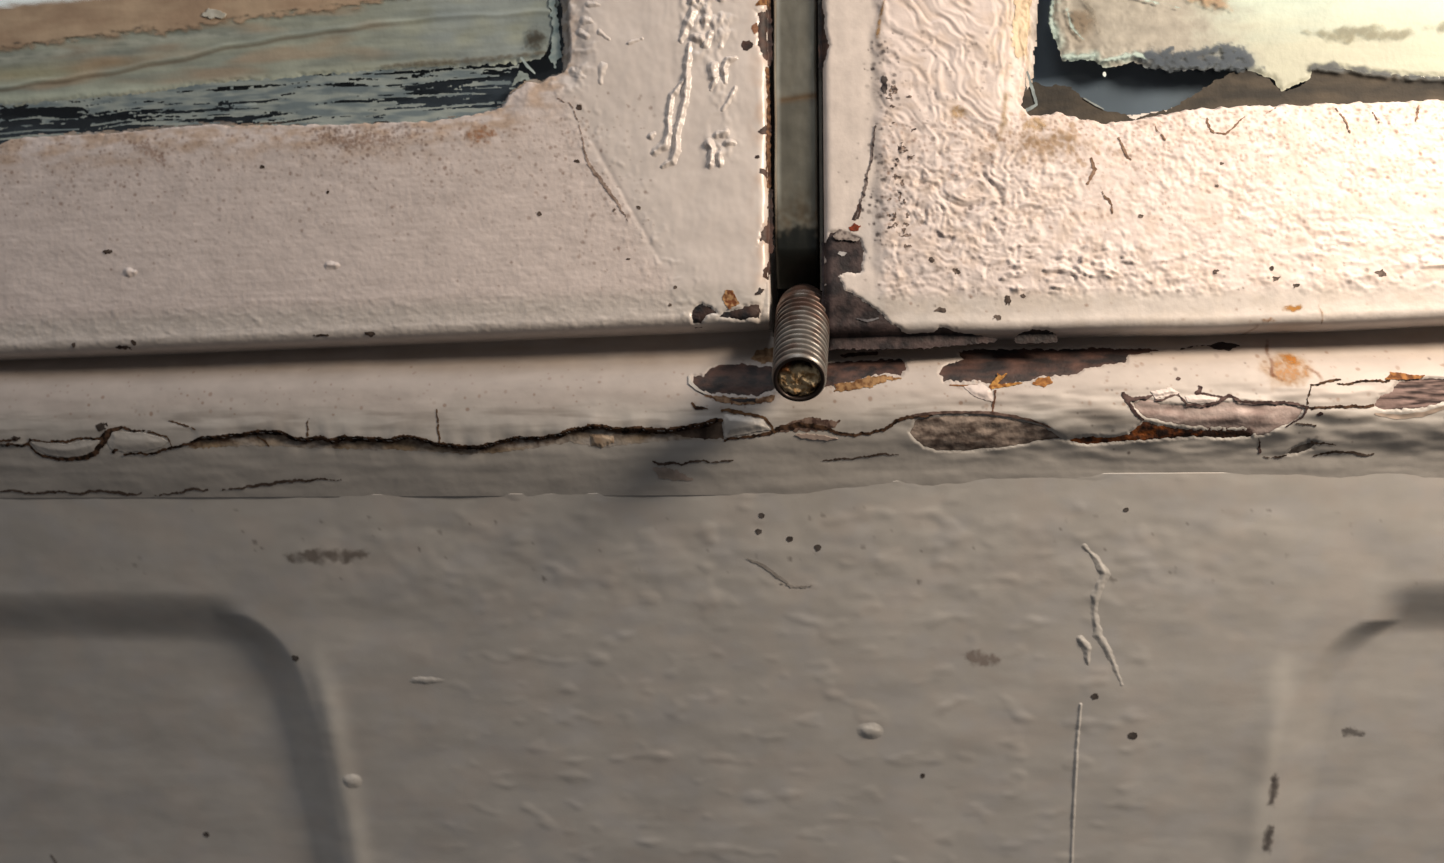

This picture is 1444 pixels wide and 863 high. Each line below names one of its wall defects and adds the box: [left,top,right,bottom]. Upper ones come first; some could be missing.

peeling [202,8,226,19]
peeling [820,202,1374,459]
peeling [688,348,775,405]
peeling [1375,372,1444,419]
crack [0,402,932,496]